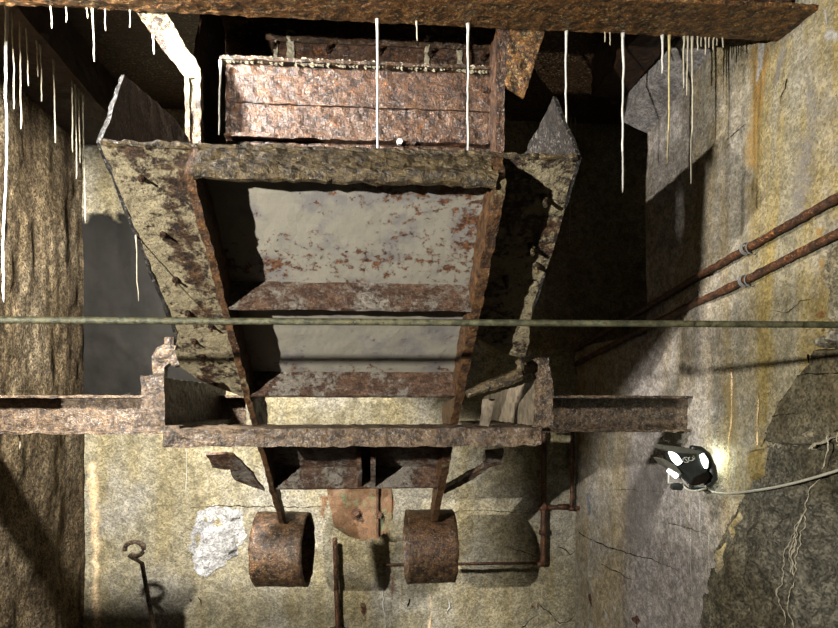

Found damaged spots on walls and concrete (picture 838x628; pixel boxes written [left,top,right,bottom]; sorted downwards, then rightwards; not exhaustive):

efflorescence [274,29,295,58]
crack [797,354,838,376]